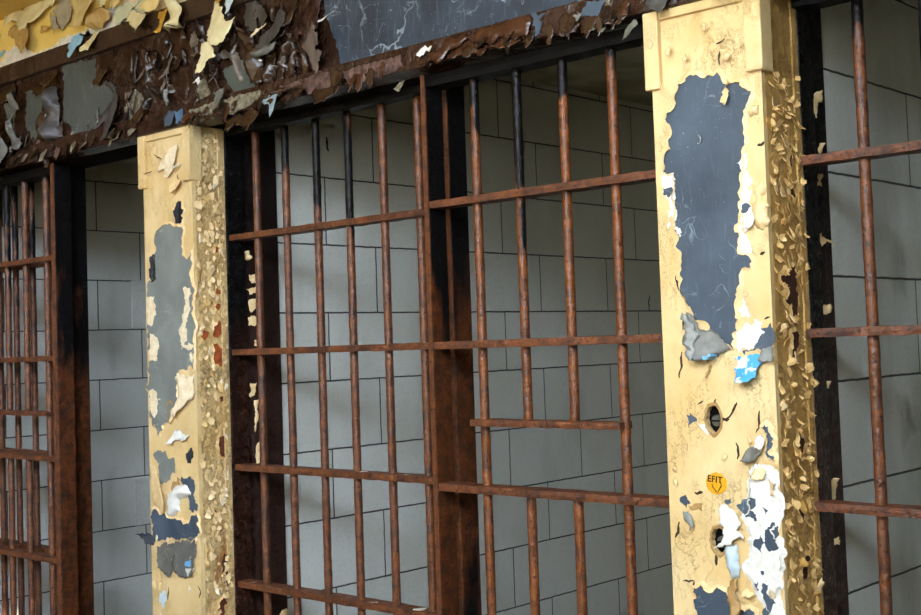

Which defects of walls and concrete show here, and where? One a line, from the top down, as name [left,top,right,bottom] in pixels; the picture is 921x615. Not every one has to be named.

peeling [0,0,638,167]
peeling [136,139,235,615]
peeling [247,274,256,326]
peeling [249,383,259,432]
peeling [661,39,836,615]
peeling [831,478,840,500]